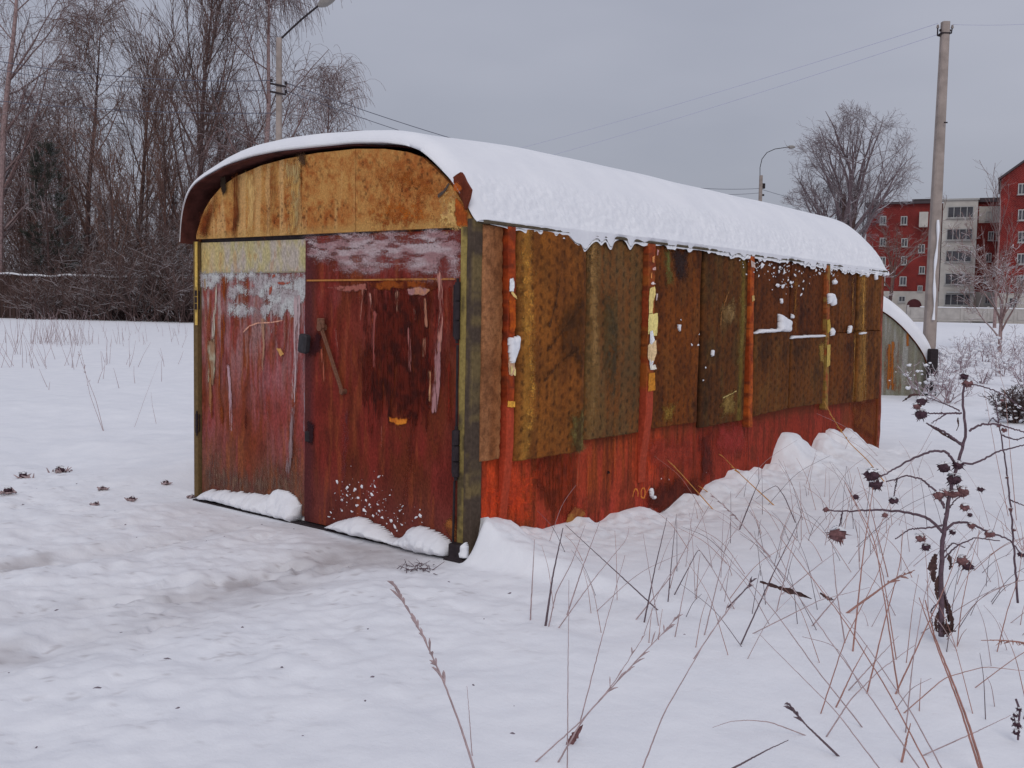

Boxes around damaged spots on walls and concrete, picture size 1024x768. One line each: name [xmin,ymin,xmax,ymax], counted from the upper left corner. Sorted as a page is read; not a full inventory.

corrosion [198,193,216,236]
corrosion [231,175,240,237]
corrosion [366,167,468,234]
corrosion [208,275,227,423]
peeling [200,269,305,473]
peeling [306,191,462,413]
corrosion [358,275,446,431]
peeling [648,249,659,391]
corrosion [647,432,715,513]